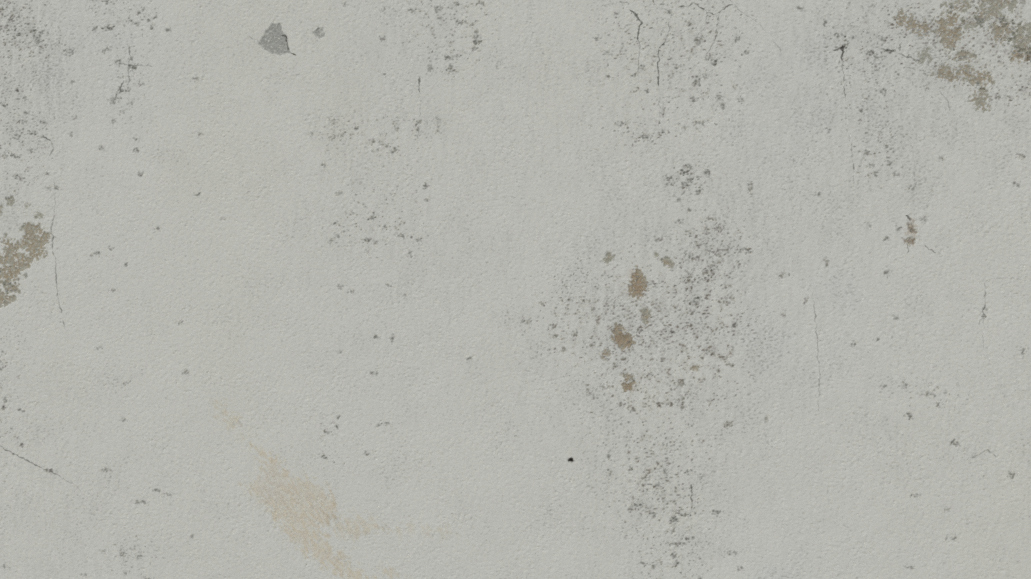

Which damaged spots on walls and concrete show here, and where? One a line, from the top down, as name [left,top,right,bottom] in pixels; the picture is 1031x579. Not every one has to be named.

spalling [259,24,296,55]
peeling [893,0,1031,113]
peeling [0,197,51,307]
spalling [628,266,651,324]
spalling [601,323,636,359]
spalling [622,374,635,392]